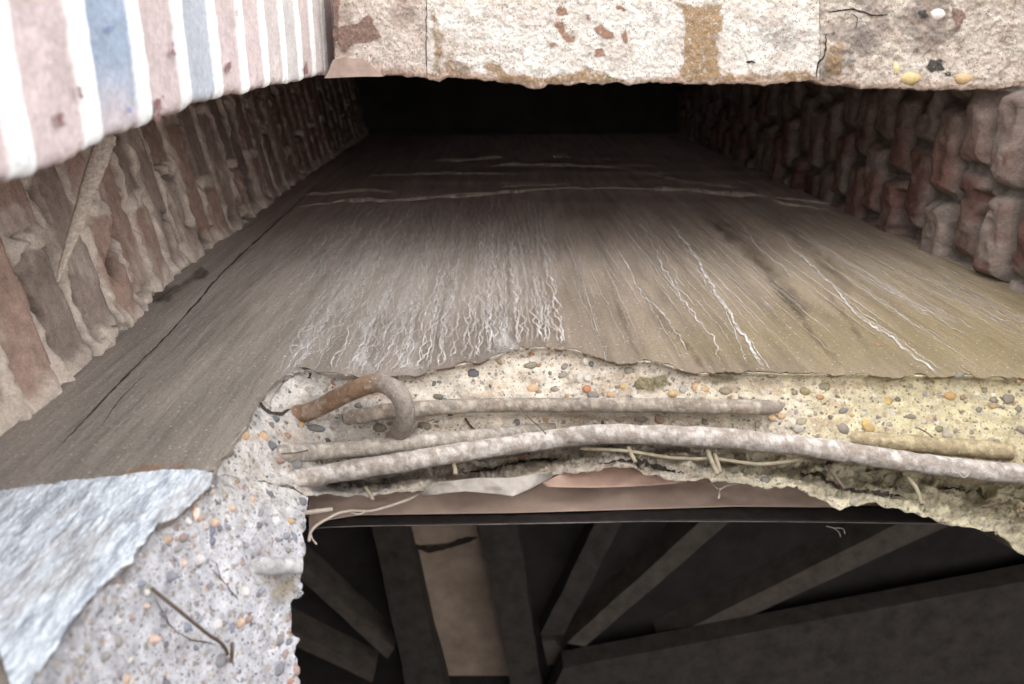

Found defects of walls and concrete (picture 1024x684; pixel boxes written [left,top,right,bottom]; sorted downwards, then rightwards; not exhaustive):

crack [816,8,888,77]
leakage [273,202,565,373]
crack [56,153,829,450]
leakage [673,227,760,359]
leakage [798,253,933,370]
spalling [0,347,1024,684]